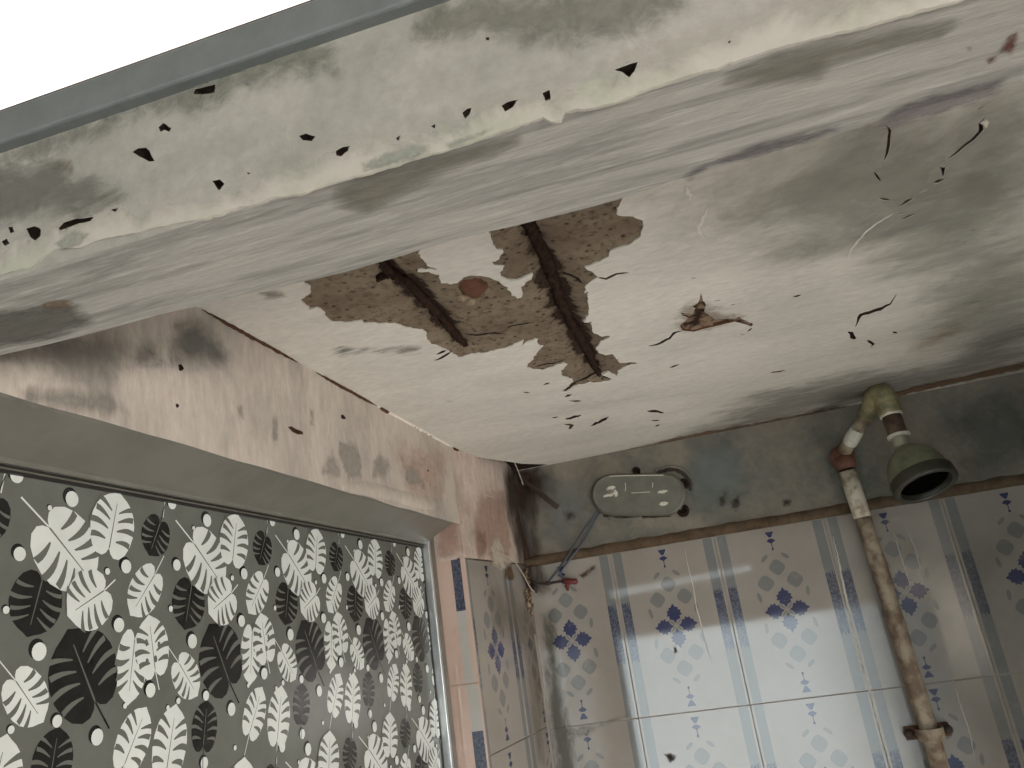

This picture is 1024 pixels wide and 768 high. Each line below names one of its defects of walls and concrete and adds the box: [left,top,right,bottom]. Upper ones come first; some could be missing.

peeling [0,0,965,276]
crack [934,106,990,183]
crack [846,126,915,260]
damp [0,308,115,375]
damp [175,327,224,361]
spalling [301,198,643,402]
crack [598,272,629,280]
spalling [650,295,753,346]
crack [848,294,897,348]
damp [27,391,116,413]
damp [505,466,586,590]